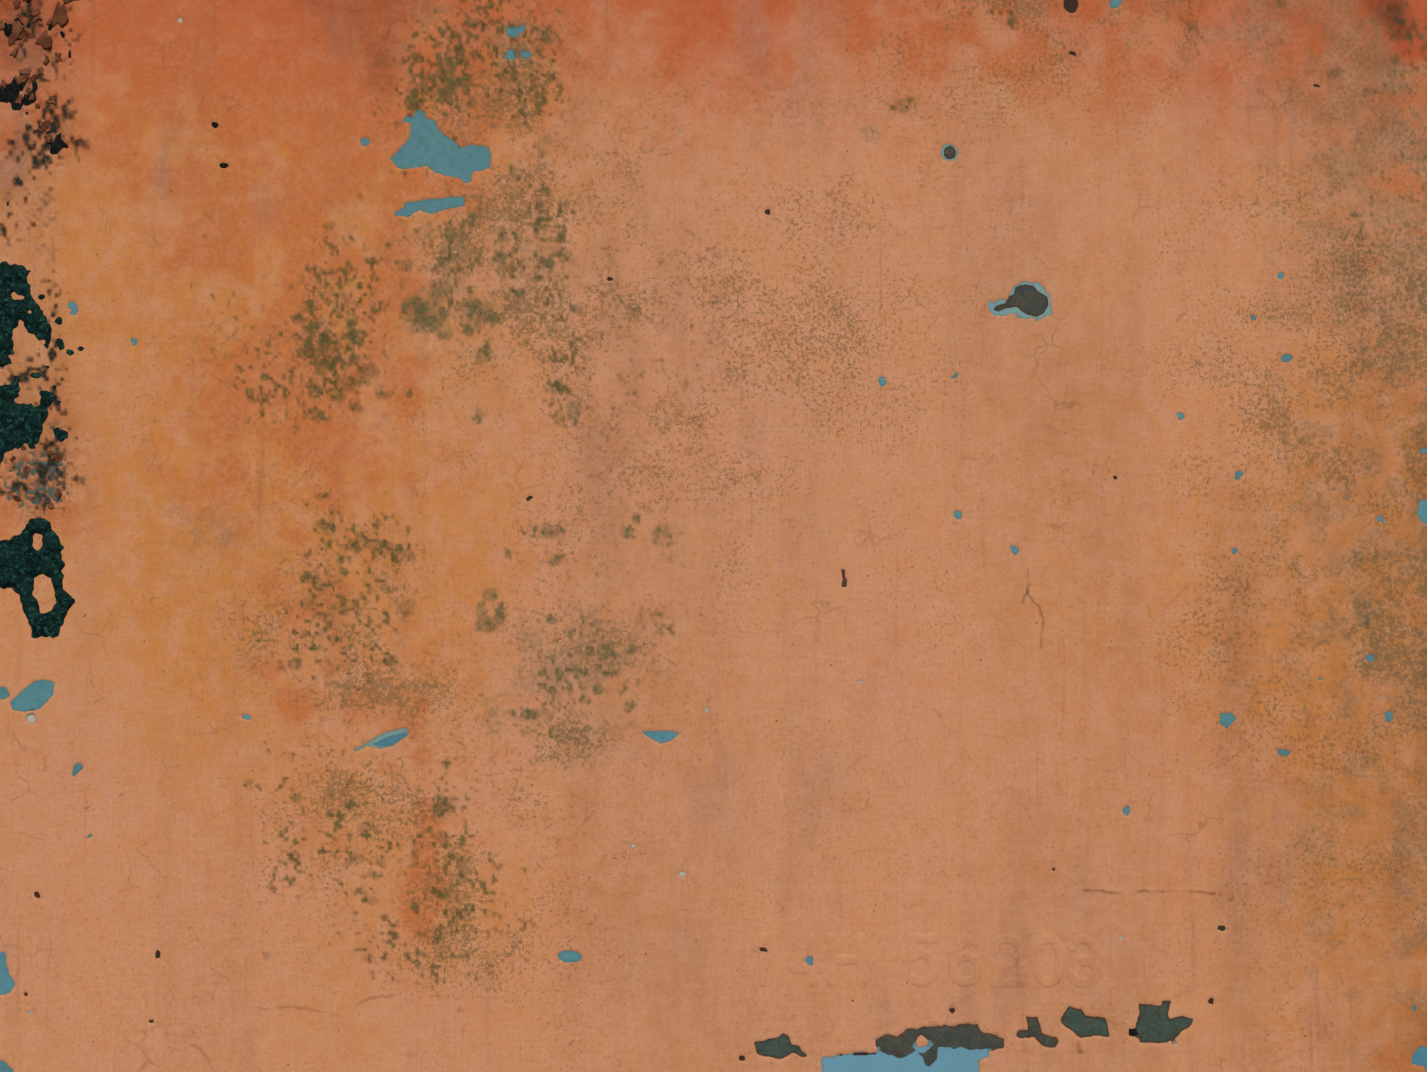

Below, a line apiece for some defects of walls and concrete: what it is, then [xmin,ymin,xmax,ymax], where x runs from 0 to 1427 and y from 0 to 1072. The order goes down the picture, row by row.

peeling [390,109,491,217]
spalling [988,281,1052,322]
peeling [0,290,84,511]
peeling [739,1006,1110,1072]
spalling [1129,1000,1193,1044]